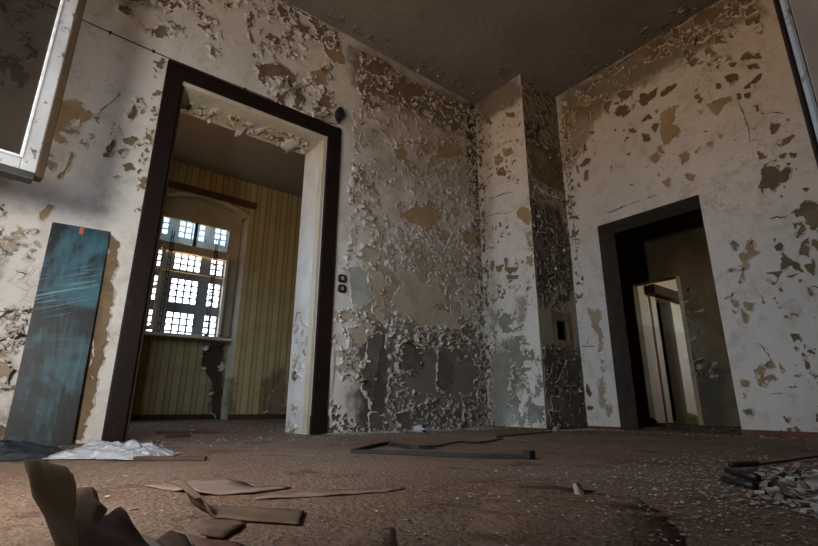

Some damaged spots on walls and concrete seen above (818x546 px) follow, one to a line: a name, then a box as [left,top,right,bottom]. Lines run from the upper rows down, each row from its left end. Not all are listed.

peeling [114,0,346,131]
peeling [46,90,162,192]
crack [95,92,122,124]
peeling [181,99,314,154]
crack [737,101,757,146]
peeling [757,118,798,198]
peeling [0,203,56,263]
peeling [327,0,766,434]
peeling [723,187,818,324]
peeling [0,304,33,394]
peeling [291,310,309,382]
peeling [739,333,818,417]